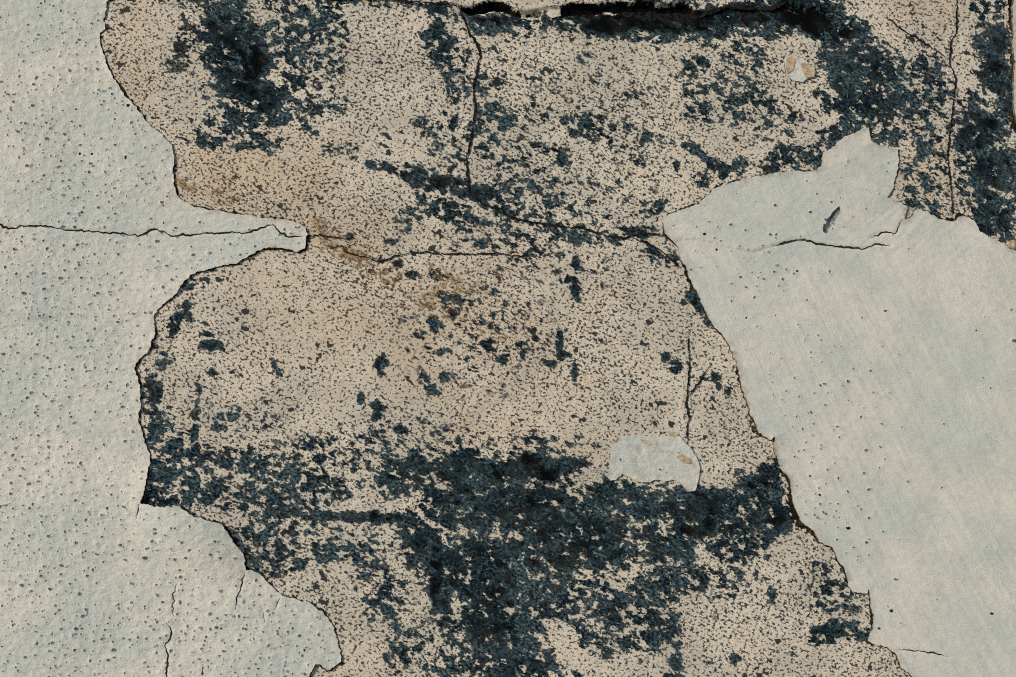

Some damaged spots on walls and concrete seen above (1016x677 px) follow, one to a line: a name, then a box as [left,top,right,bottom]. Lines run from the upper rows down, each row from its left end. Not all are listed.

crack [0,223,530,262]
peeling [100,0,911,677]
crack [395,0,680,268]
leakage [164,0,1016,303]
crack [561,1,787,31]
crack [775,220,902,250]
peeling [819,0,1016,222]
peeling [985,177,1016,245]
leakage [140,259,794,677]
leakage [804,560,873,647]